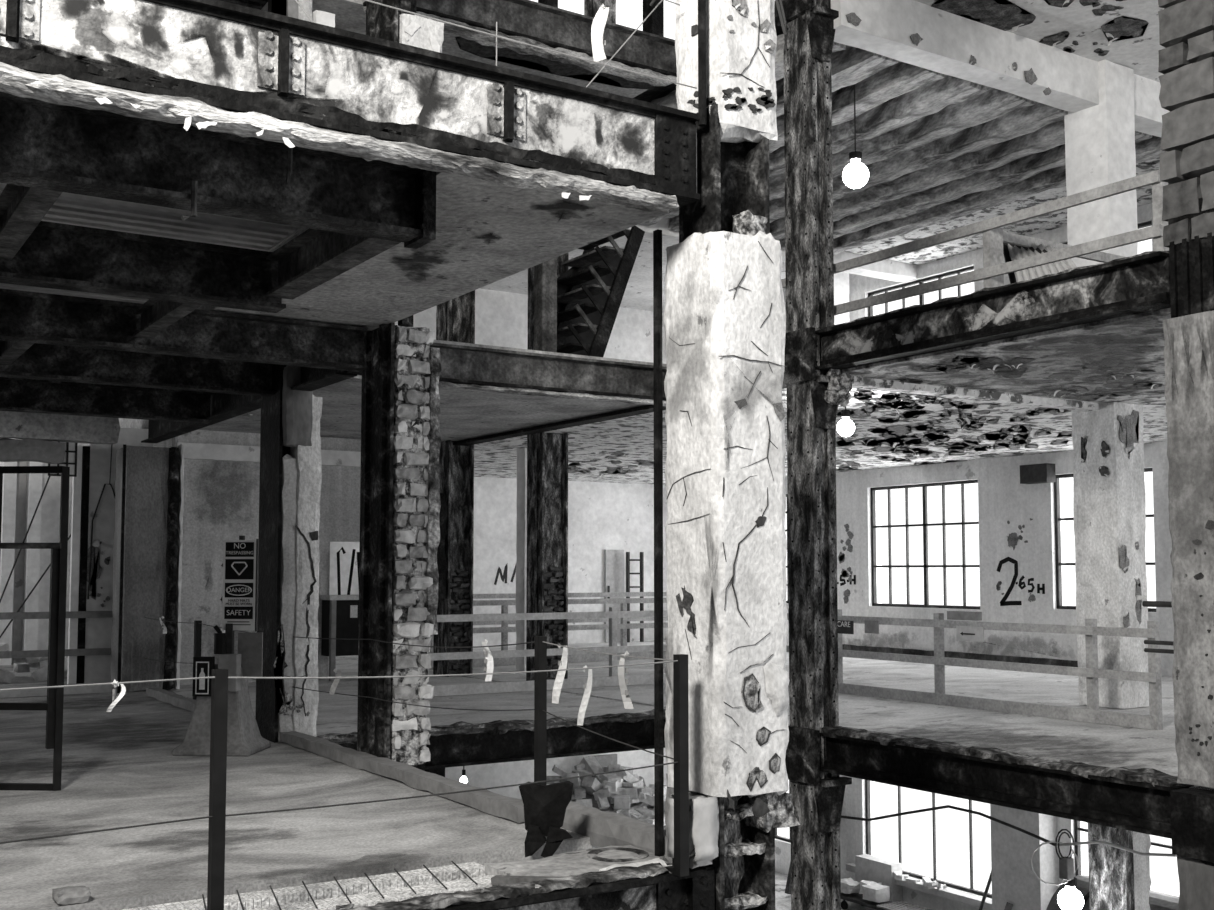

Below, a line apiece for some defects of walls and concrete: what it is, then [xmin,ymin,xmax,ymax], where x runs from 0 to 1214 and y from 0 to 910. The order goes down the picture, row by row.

crack [723,0,770,88]
peeling [846,12,862,26]
peeling [931,0,1036,33]
peeling [1012,62,1051,95]
peeling [1039,0,1149,56]
crack [667,241,786,653]
peeling [836,356,1162,477]
crack [284,525,318,716]
peeling [1118,541,1146,628]
flaking render [724,654,773,712]
flaking render [730,726,786,817]
flaking render [1189,724,1212,756]